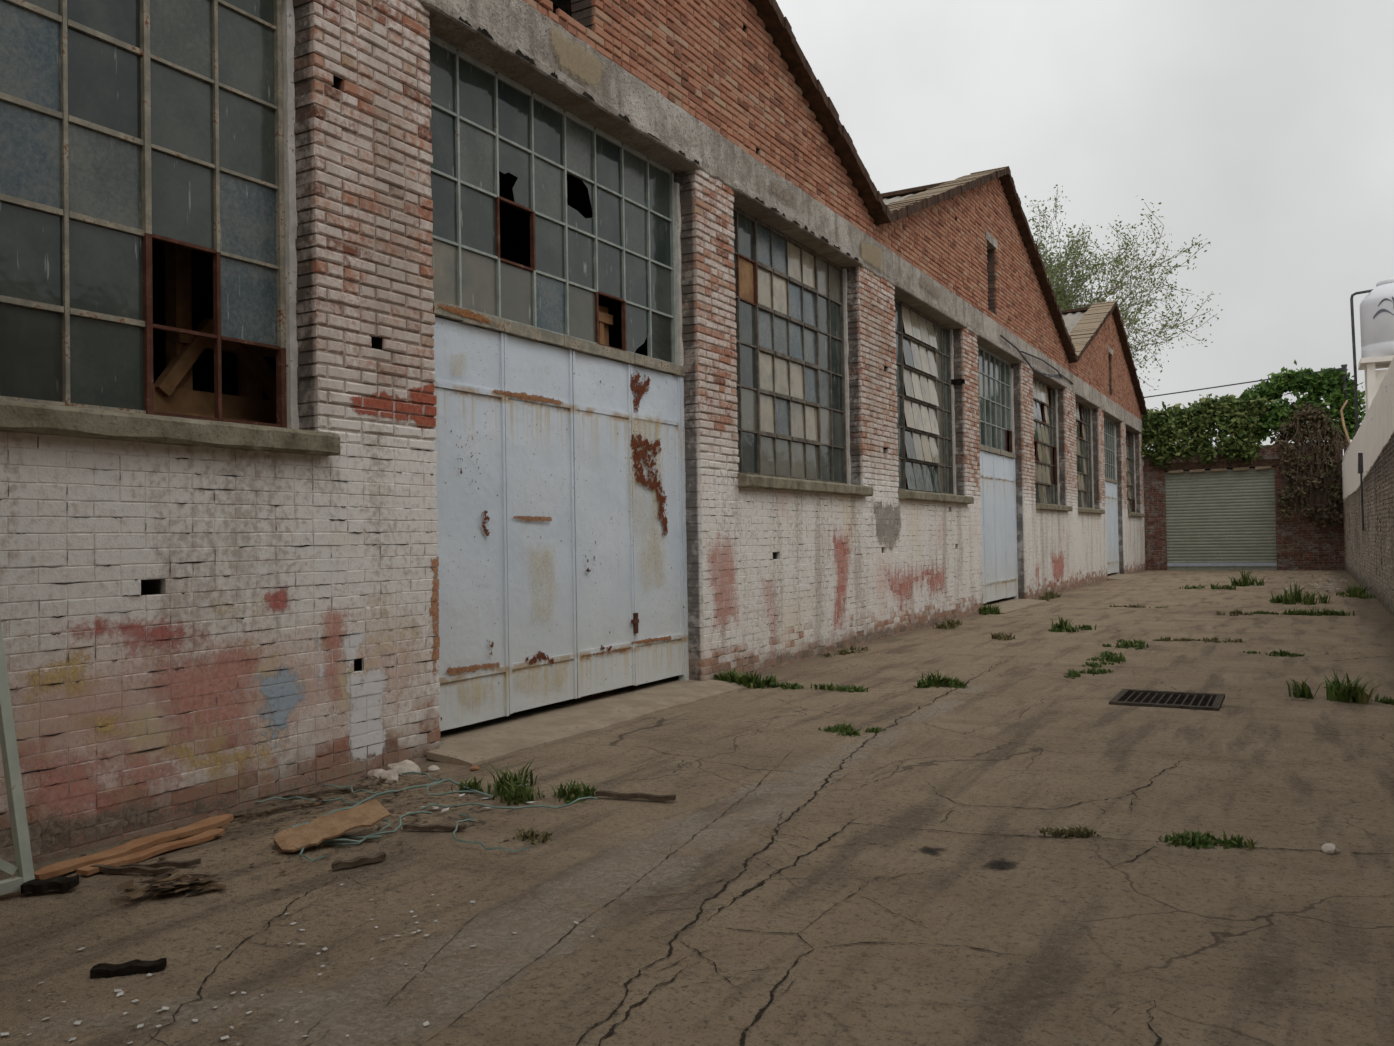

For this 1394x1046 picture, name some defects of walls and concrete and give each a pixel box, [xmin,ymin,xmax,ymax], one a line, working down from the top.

peeling [350,382,437,430]
corrosion [630,373,651,412]
corrosion [630,430,668,536]
leakage [874,503,901,549]
corrosion [525,650,554,664]
crack [332,658,1205,1046]
crack [142,876,414,1046]